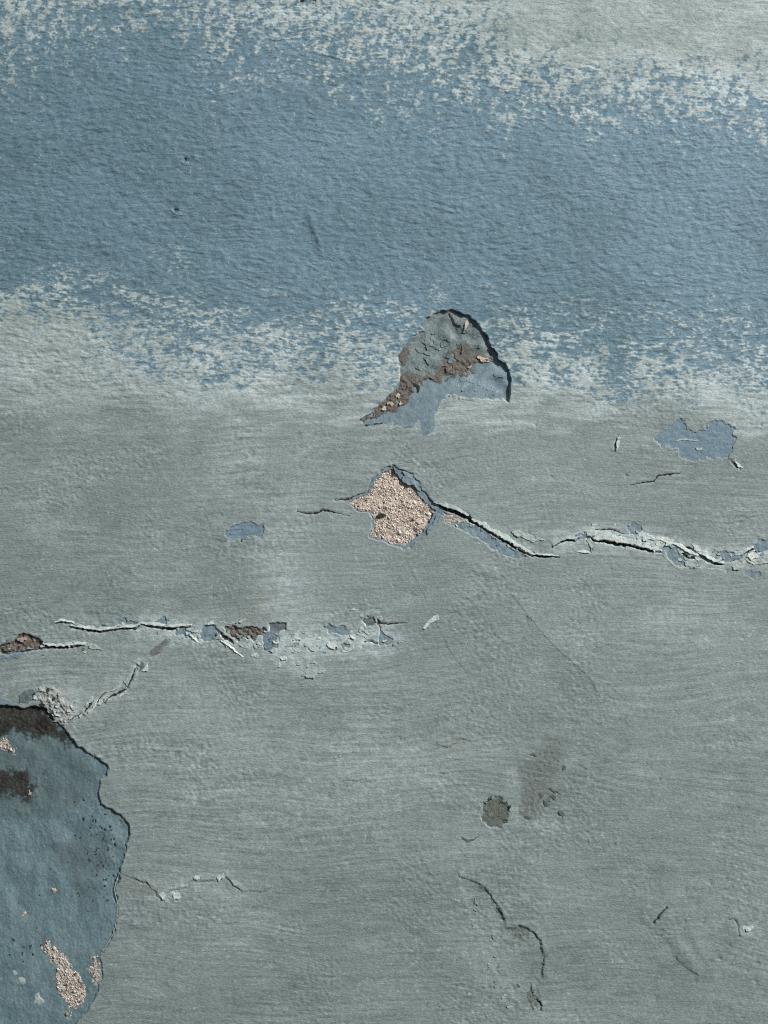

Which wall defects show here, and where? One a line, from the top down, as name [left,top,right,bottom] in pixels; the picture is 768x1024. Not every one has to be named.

peeling [359,311,510,437]
spalling [348,465,444,549]
crack [433,501,768,579]
crack [631,473,680,485]
crack [0,608,407,723]
peeling [0,683,129,1024]
crack [119,871,278,903]
hole [481,796,511,828]
crack [452,873,545,1010]